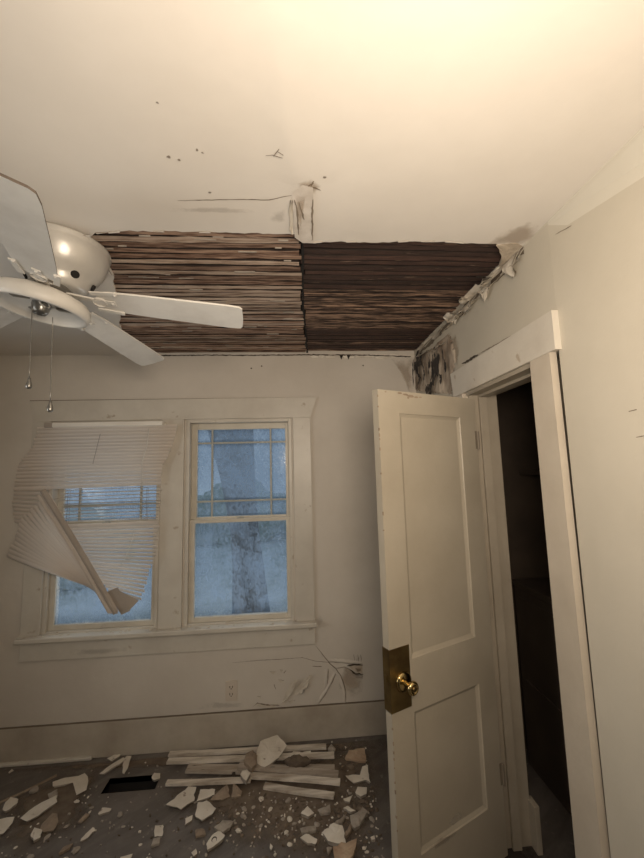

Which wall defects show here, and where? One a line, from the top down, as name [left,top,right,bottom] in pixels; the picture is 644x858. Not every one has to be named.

crack [178,181,321,201]
spalling [161,247,524,399]
crack [234,645,363,704]